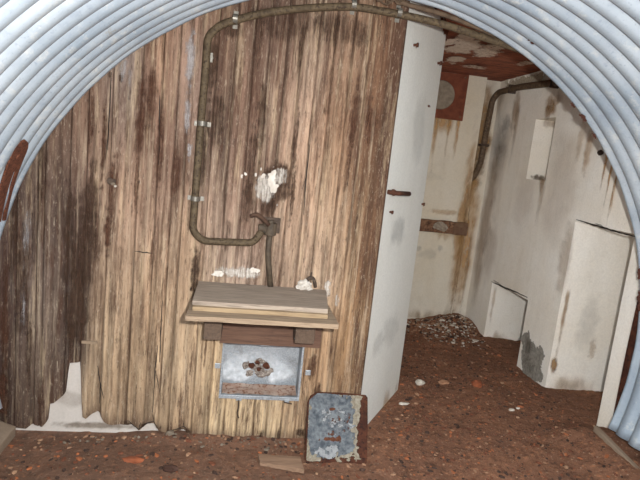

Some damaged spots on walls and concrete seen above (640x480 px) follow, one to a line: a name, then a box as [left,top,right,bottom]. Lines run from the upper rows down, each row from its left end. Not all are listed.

peeling [442,29,504,70]
spalling [241,163,290,209]
corrosion [419,187,475,288]